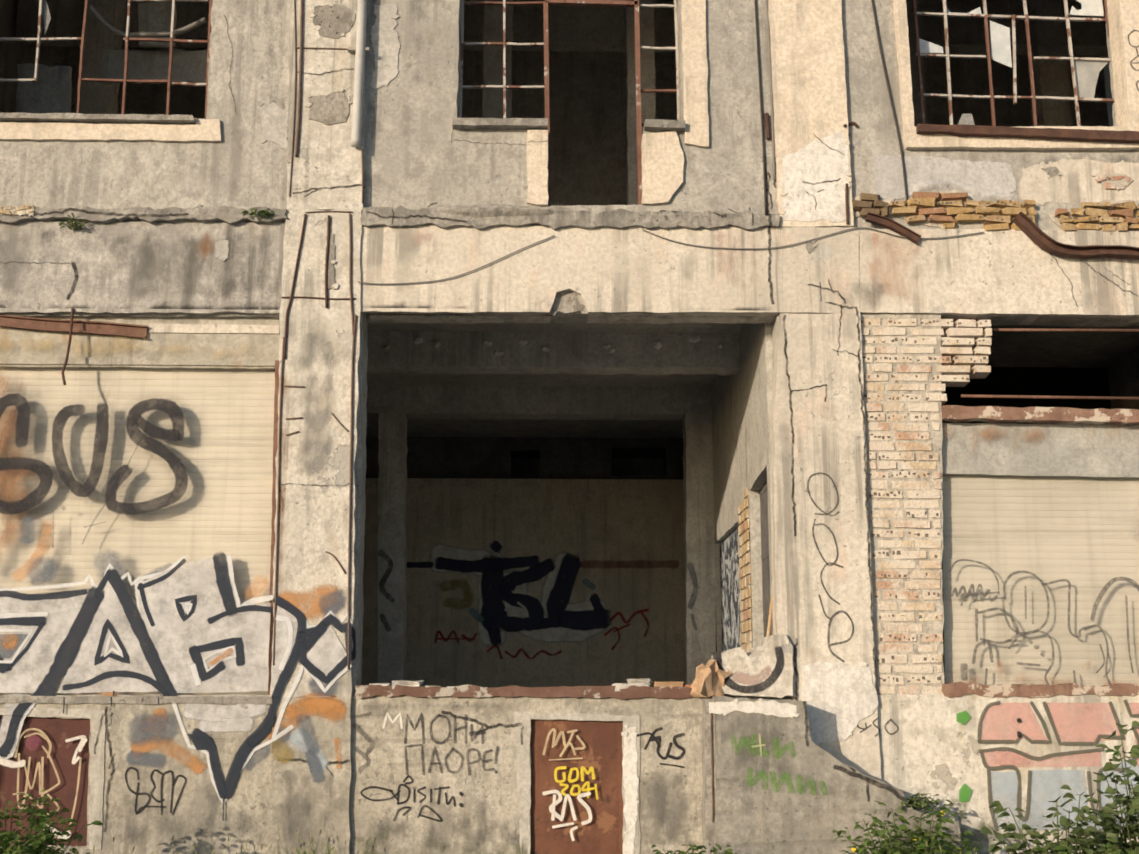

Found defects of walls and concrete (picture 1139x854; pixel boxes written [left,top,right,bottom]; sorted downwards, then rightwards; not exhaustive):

spalling [310,2,356,39]
peeling [370,3,401,89]
spalling [305,88,352,125]
crack [803,133,844,209]
peeling [779,130,1139,232]
rust [0,314,148,339]
crack [661,157,827,536]
rust [273,149,364,669]
crack [808,280,876,688]
peeling [709,661,878,745]